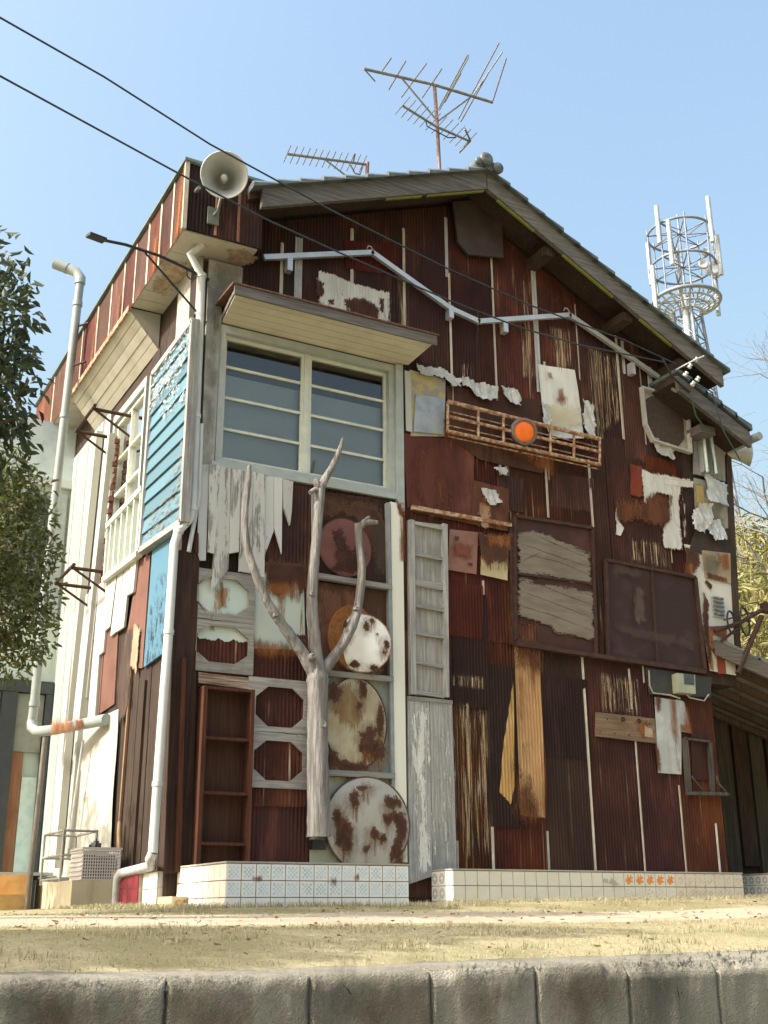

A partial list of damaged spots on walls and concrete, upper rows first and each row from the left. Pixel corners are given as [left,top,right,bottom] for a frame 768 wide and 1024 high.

peeling [315,270,391,321]
peeling [149,331,189,418]
peeling [144,441,183,539]
corrosion [323,497,386,574]
corrosion [397,364,554,570]
corrosion [615,463,672,527]
peeling [641,469,694,550]
corrosion [363,618,390,654]
corrosion [50,718,83,736]
corrosion [328,681,409,864]
peeling [410,704,455,874]
corrosion [459,704,489,850]